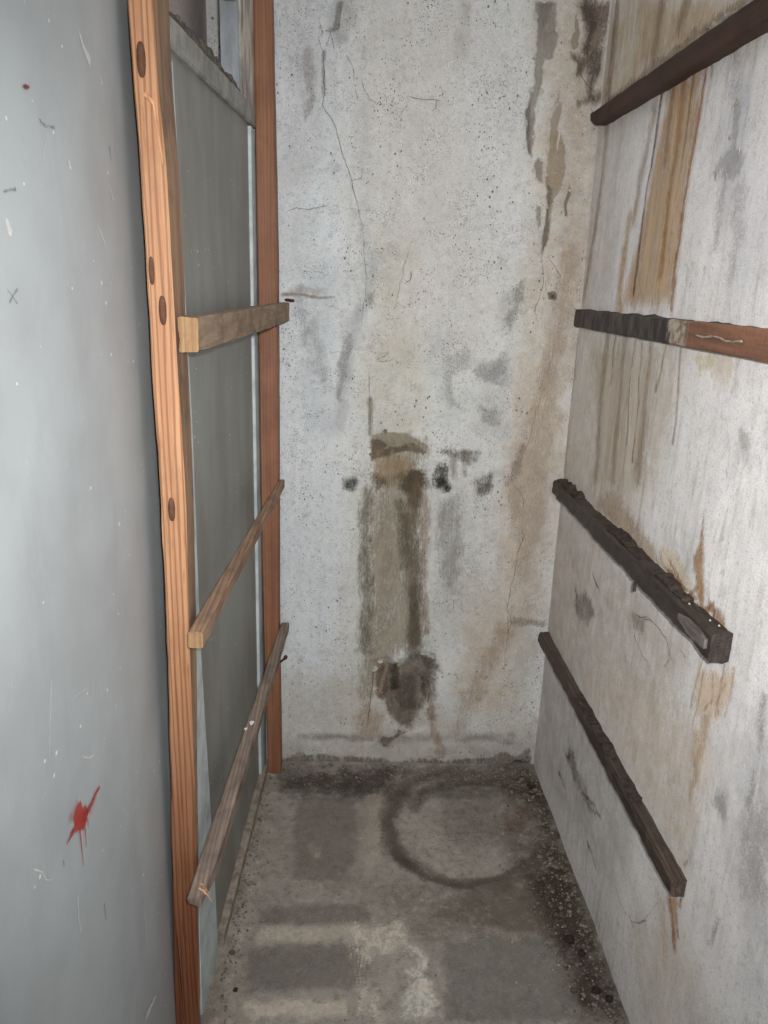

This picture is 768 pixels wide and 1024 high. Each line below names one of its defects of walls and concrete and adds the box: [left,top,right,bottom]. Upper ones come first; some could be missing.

rust [618,70,707,313]
damp [358,399,476,697]
damp [475,474,492,496]
rust [668,542,724,626]
damp [281,730,616,1019]